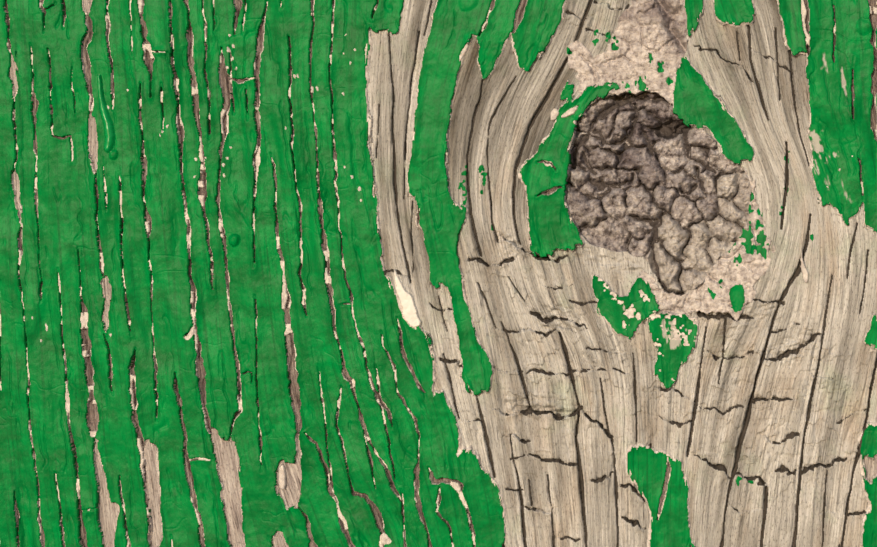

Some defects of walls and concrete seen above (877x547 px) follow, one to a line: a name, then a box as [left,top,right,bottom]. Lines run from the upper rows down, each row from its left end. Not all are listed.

crack [4,0,476,547]
peeling [343,0,877,547]
crack [439,0,877,547]